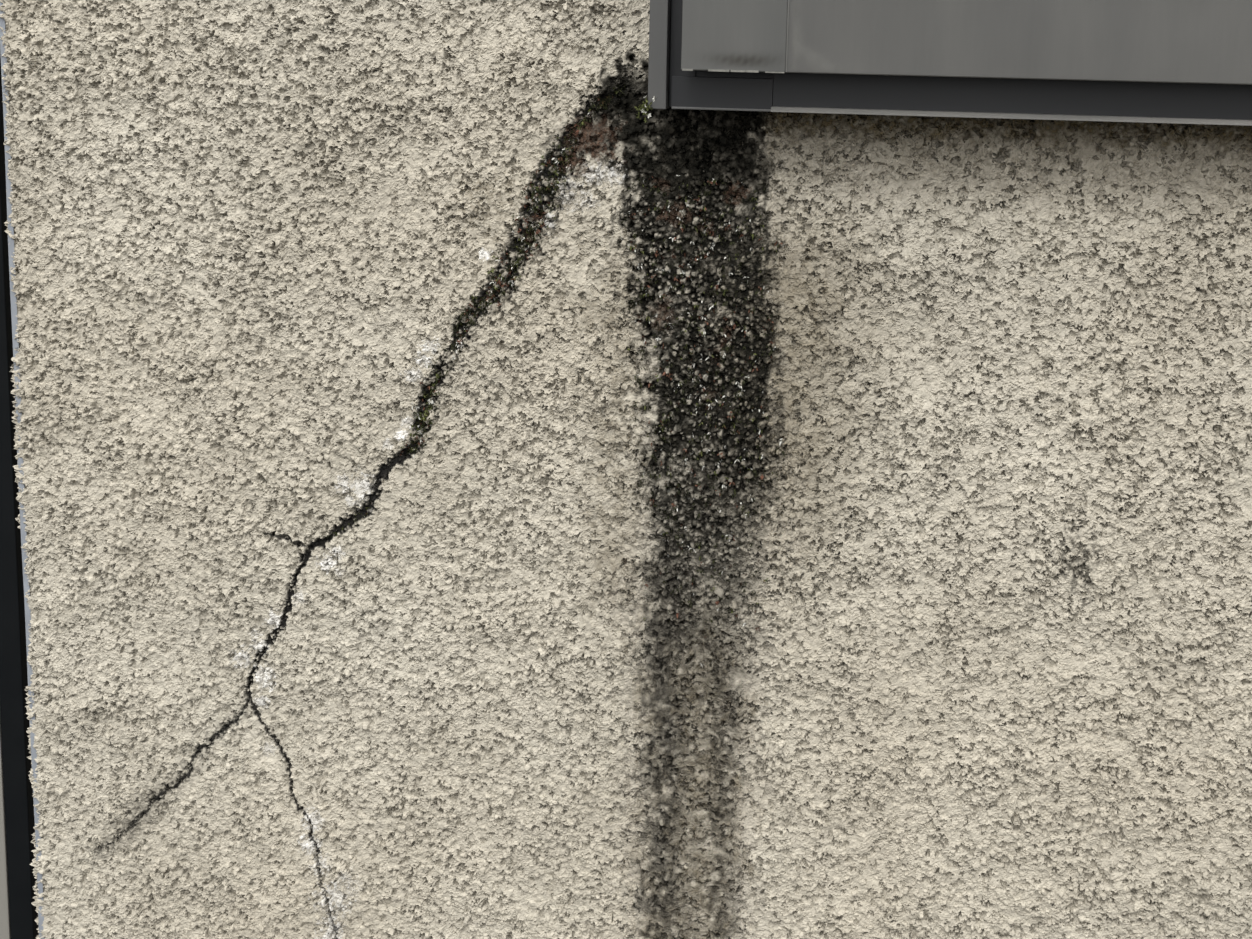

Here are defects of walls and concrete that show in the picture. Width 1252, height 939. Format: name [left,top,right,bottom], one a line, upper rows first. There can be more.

crack [118,85,633,939]
leakage [585,52,1252,939]